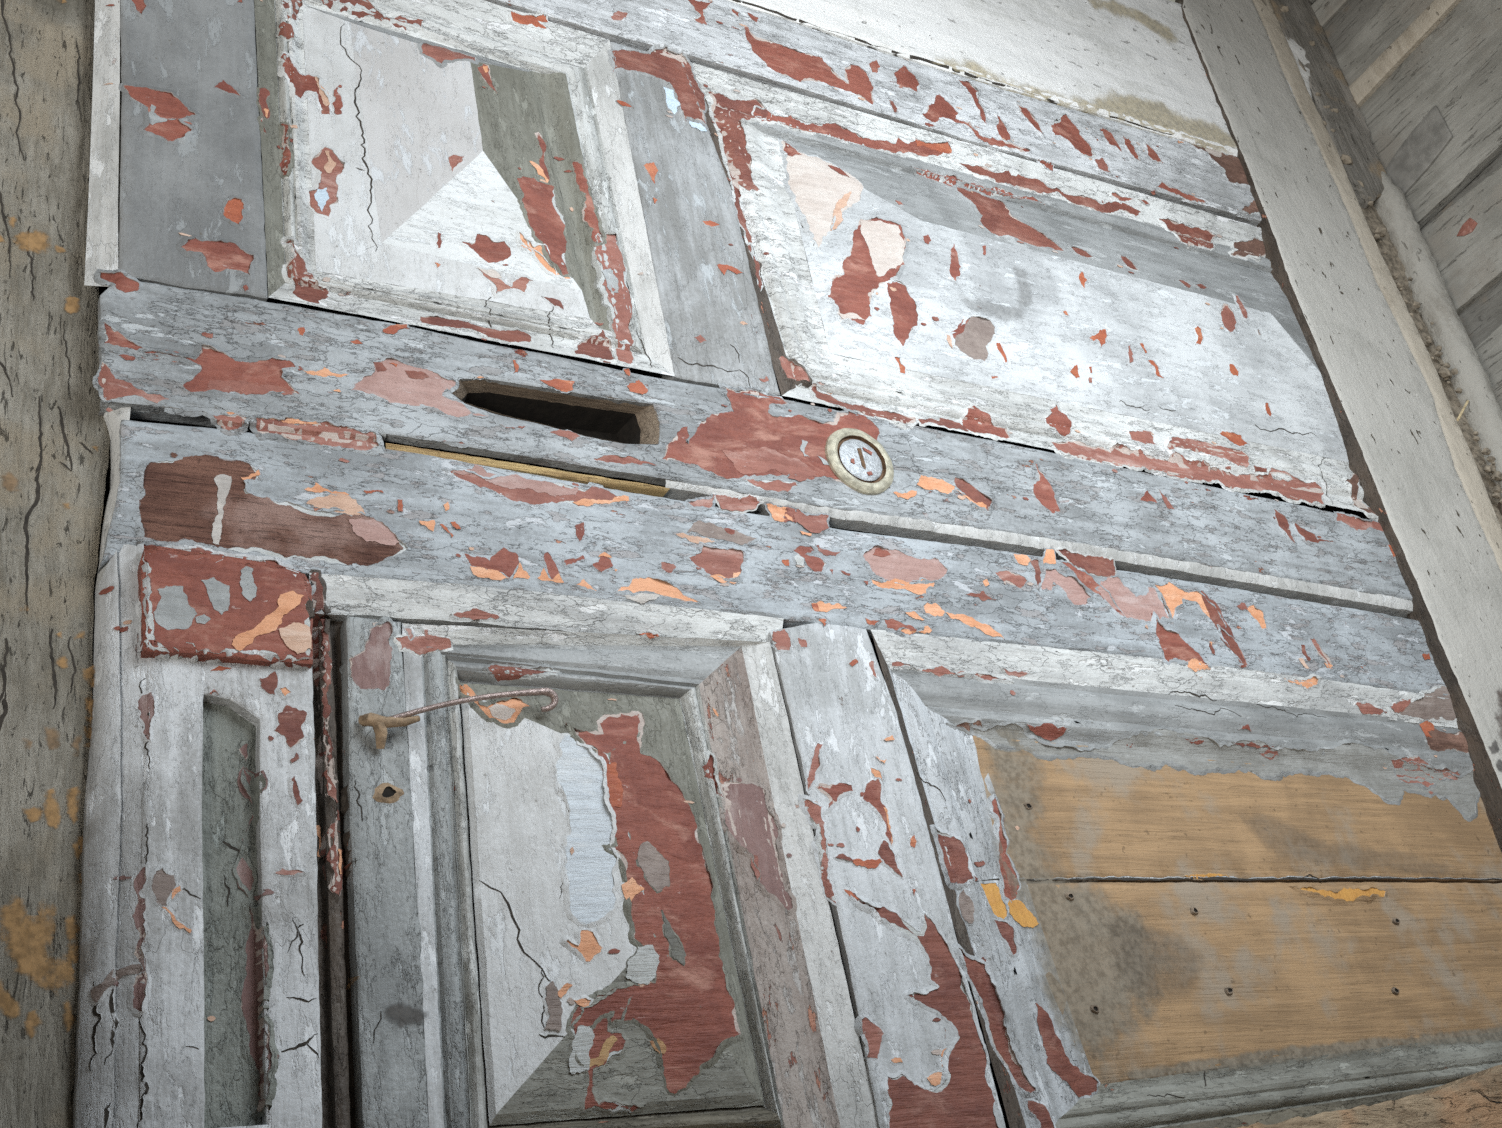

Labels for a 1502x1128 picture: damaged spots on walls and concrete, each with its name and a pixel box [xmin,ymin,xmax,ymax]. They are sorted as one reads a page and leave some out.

crack [340,24,378,251]
peeling [608,0,1266,381]
peeling [433,130,649,396]
peeling [92,320,526,463]
peeling [381,313,535,374]
peeling [114,354,1268,1128]
peeling [945,685,1480,822]
water stain [1489,691,1502,771]
crack [479,880,564,1039]
crack [955,873,1502,883]
peeling [1289,883,1388,904]